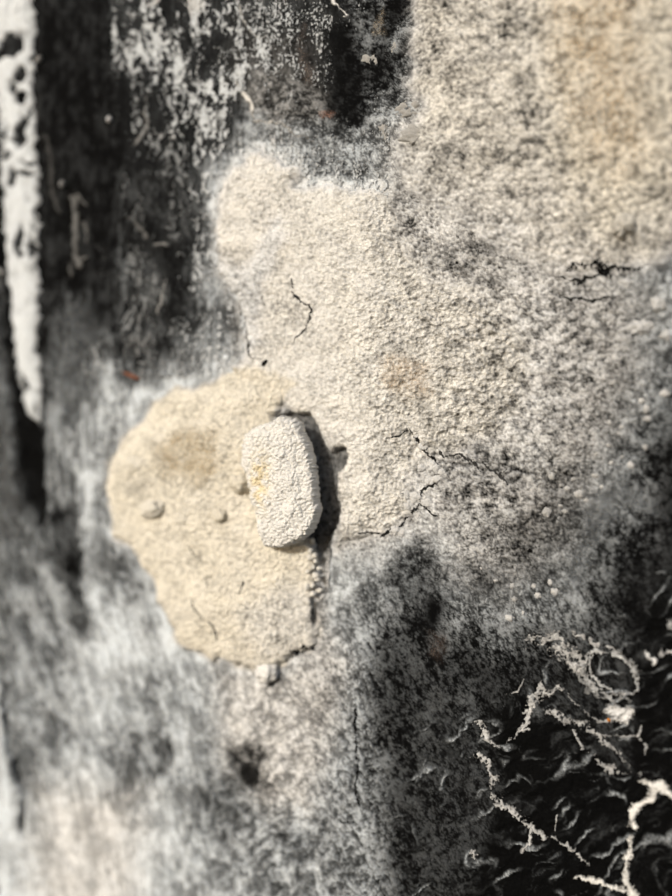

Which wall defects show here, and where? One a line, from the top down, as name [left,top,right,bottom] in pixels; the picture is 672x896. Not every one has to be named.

crack [290,278,313,341]
crack [557,256,649,303]
crack [275,409,509,600]